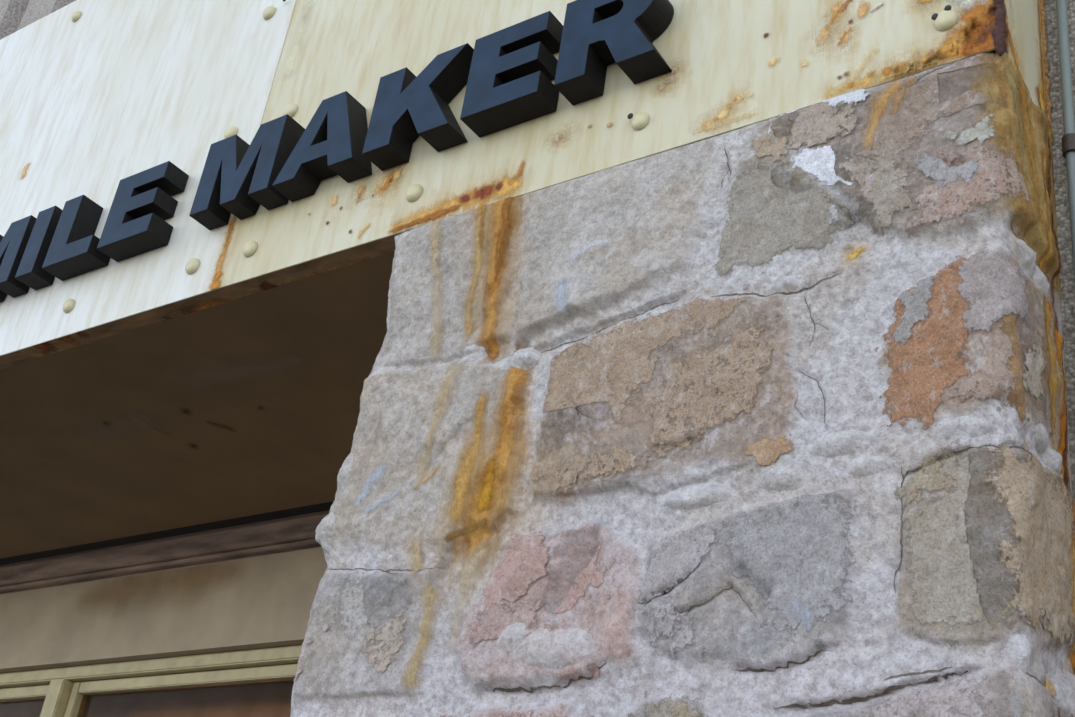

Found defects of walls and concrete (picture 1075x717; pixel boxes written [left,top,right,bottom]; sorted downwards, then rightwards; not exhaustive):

corrosion [817,0,883,45]
corrosion [182,216,235,315]
corrosion [392,162,524,361]
peeling [715,52,1031,276]
corrosion [827,0,1075,615]
corrosion [444,367,529,577]
corrosion [406,582,435,685]